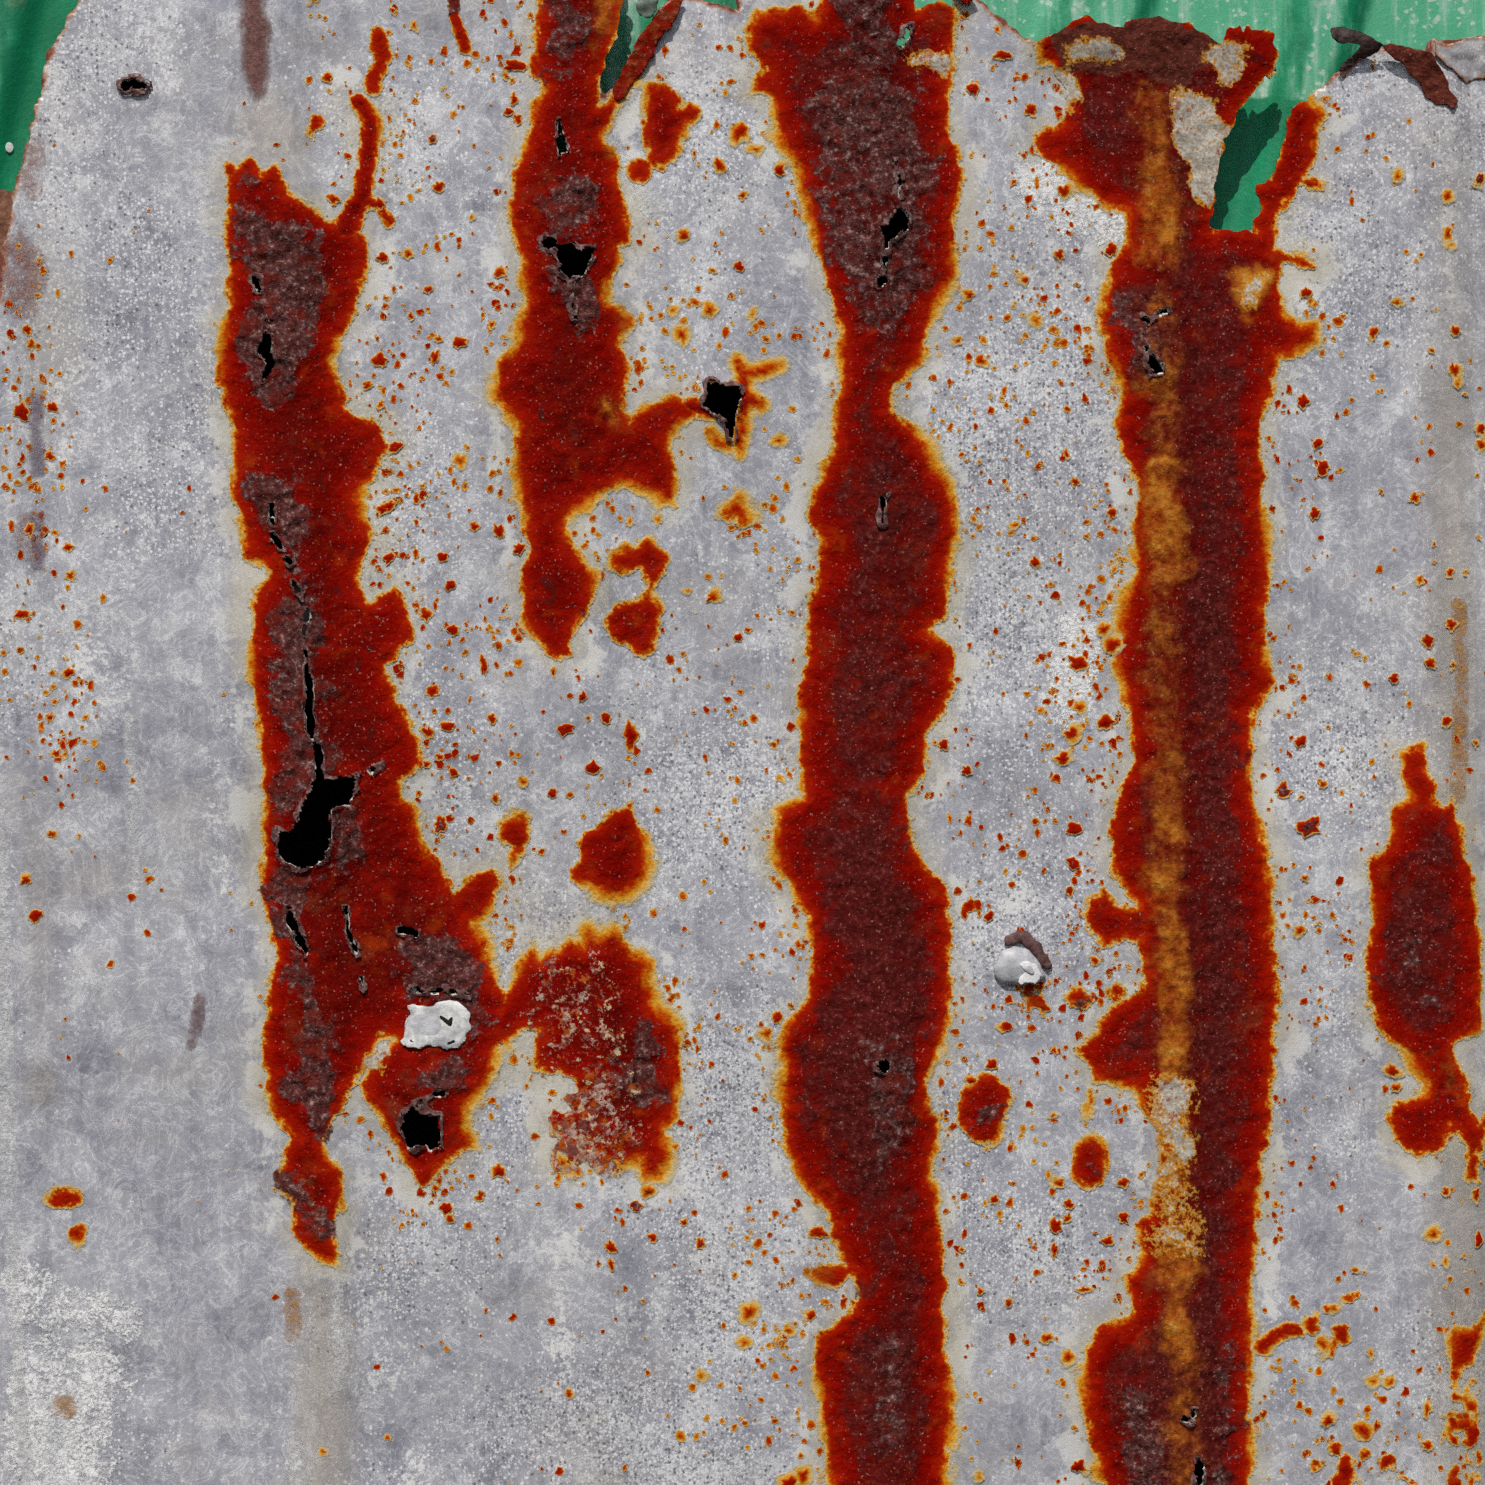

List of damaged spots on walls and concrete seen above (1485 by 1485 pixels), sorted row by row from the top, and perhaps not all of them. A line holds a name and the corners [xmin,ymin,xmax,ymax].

rust [240,0,271,105]
rust [304,106,326,145]
rust [1364,131,1418,192]
rust [1427,347,1482,396]
rust [973,379,1089,470]
rust [1375,527,1470,594]
rust [680,573,723,628]
rust [691,675,770,726]
rust [946,787,1088,888]
rust [1295,815,1328,838]
rust [680,1210,707,1250]
rust [666,1397,764,1456]